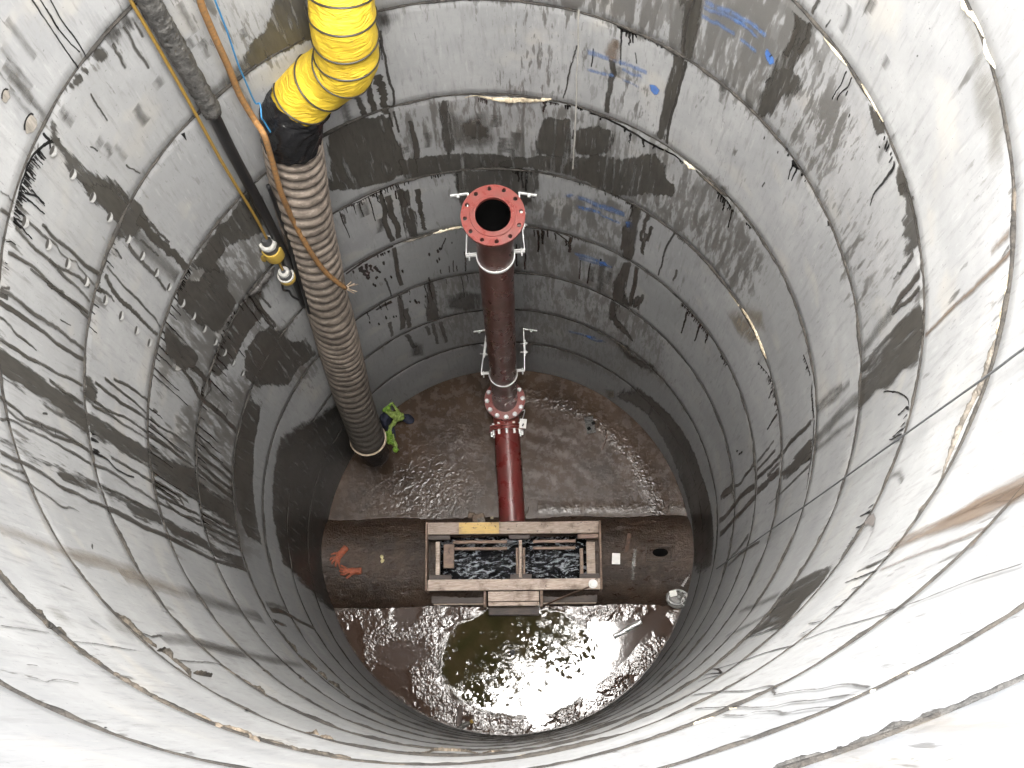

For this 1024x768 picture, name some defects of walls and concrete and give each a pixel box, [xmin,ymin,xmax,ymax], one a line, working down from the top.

water stain [0,121,316,572]
water stain [326,0,702,355]
water stain [609,165,925,571]
water stain [758,0,820,117]
water stain [869,105,885,148]
water stain [694,563,1022,716]